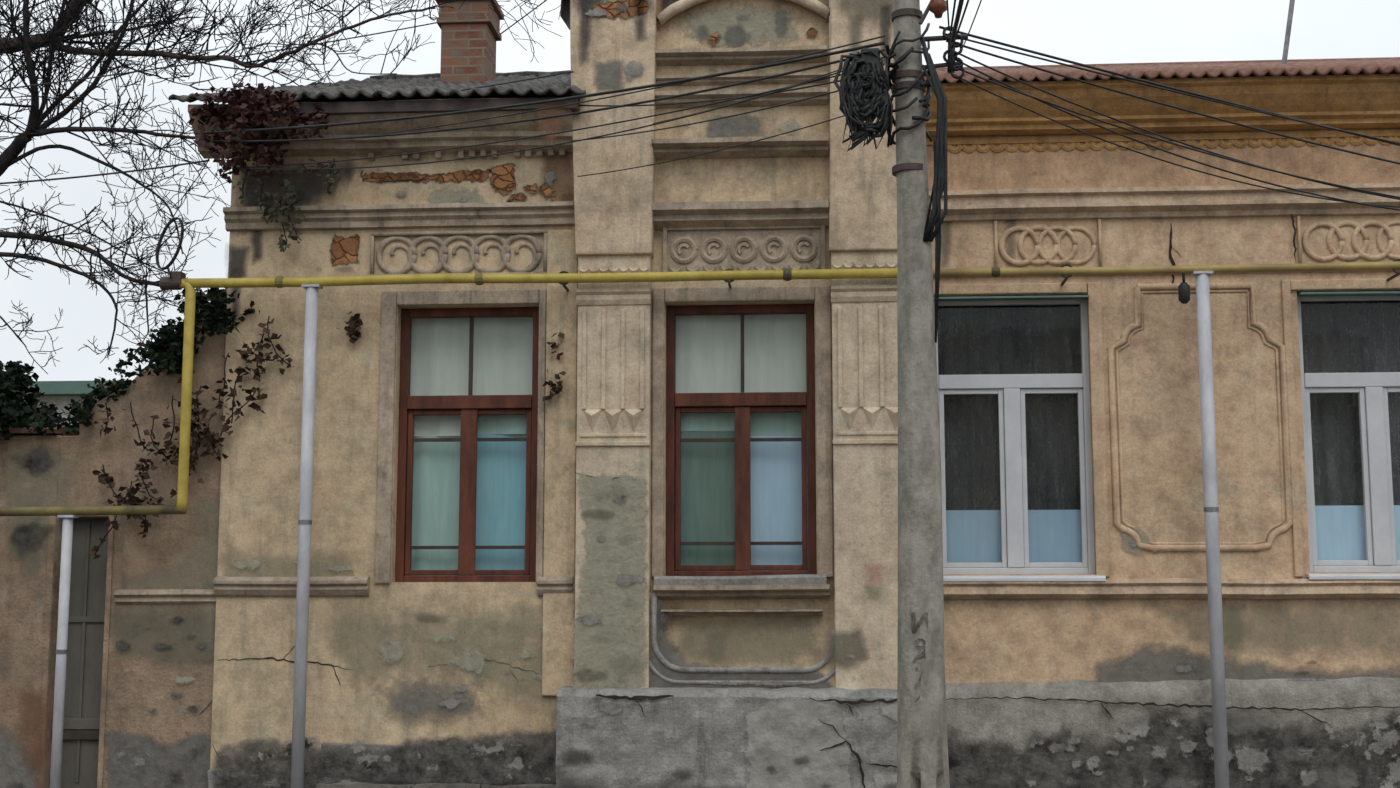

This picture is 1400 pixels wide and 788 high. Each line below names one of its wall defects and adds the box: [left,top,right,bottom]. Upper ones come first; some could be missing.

flaking render [360,156,571,204]
flaking render [329,234,360,270]
peeling [572,473,667,689]
crack [221,646,353,684]
crack [946,696,1400,725]
crack [810,698,897,788]
flaking render [947,696,1400,788]